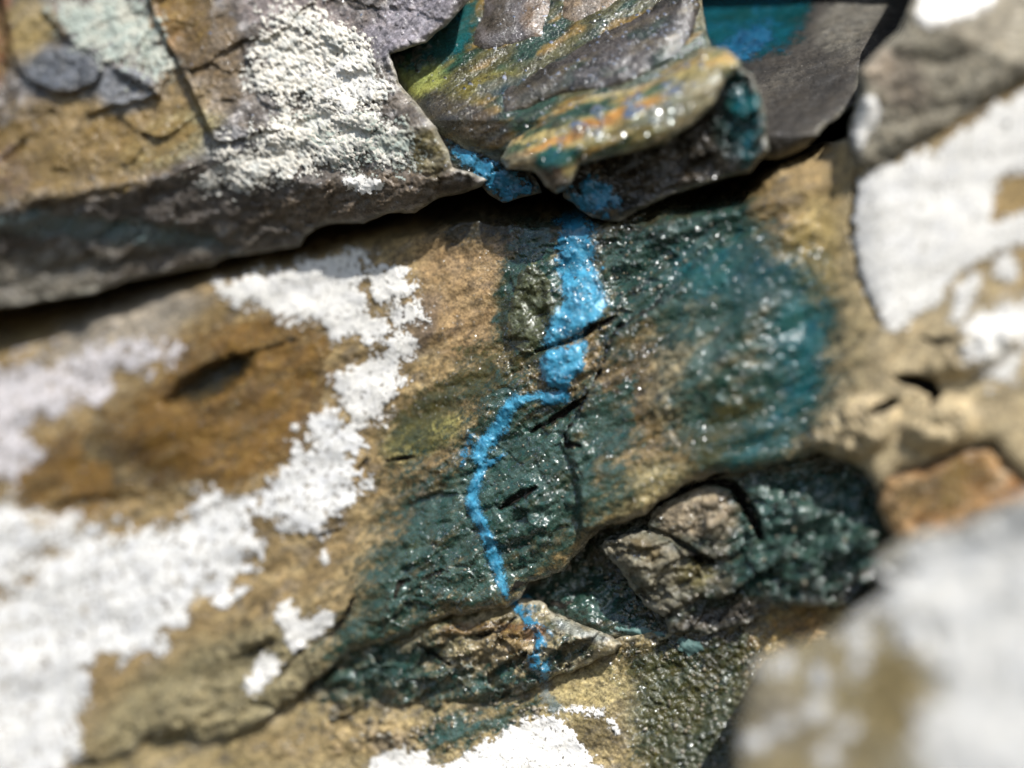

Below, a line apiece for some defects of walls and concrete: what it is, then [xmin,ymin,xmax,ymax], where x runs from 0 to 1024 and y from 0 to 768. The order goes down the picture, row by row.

crack [533,297,662,448]
crack [500,485,538,510]